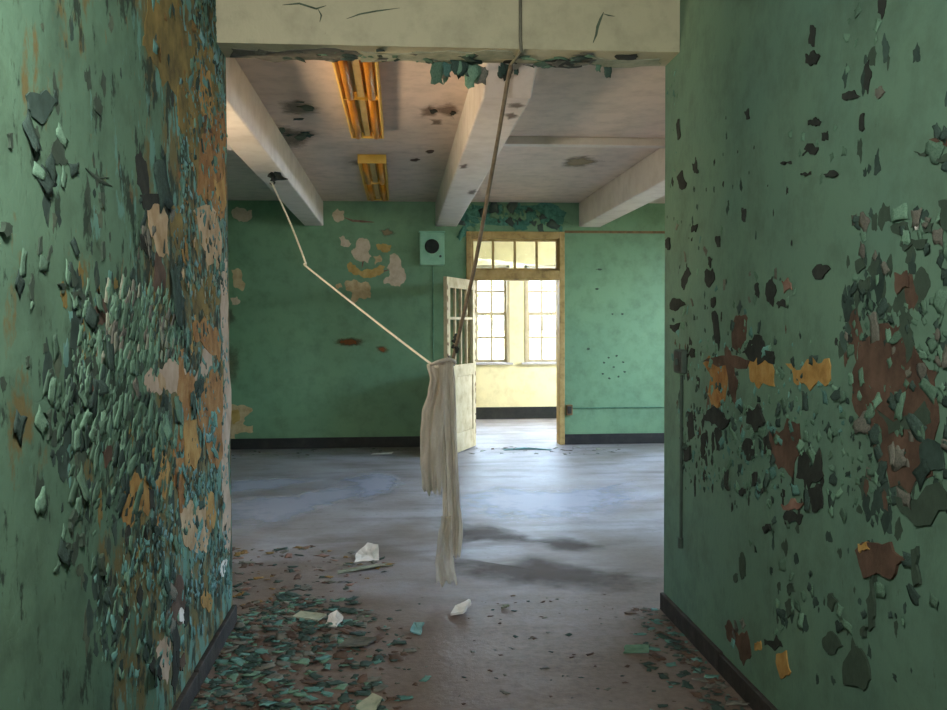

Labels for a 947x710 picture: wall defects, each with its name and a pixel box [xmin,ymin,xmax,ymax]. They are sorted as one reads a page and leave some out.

damp [279,101,314,145]
damp [423,107,456,124]
peeling [670,157,750,192]
peeling [7,0,661,710]